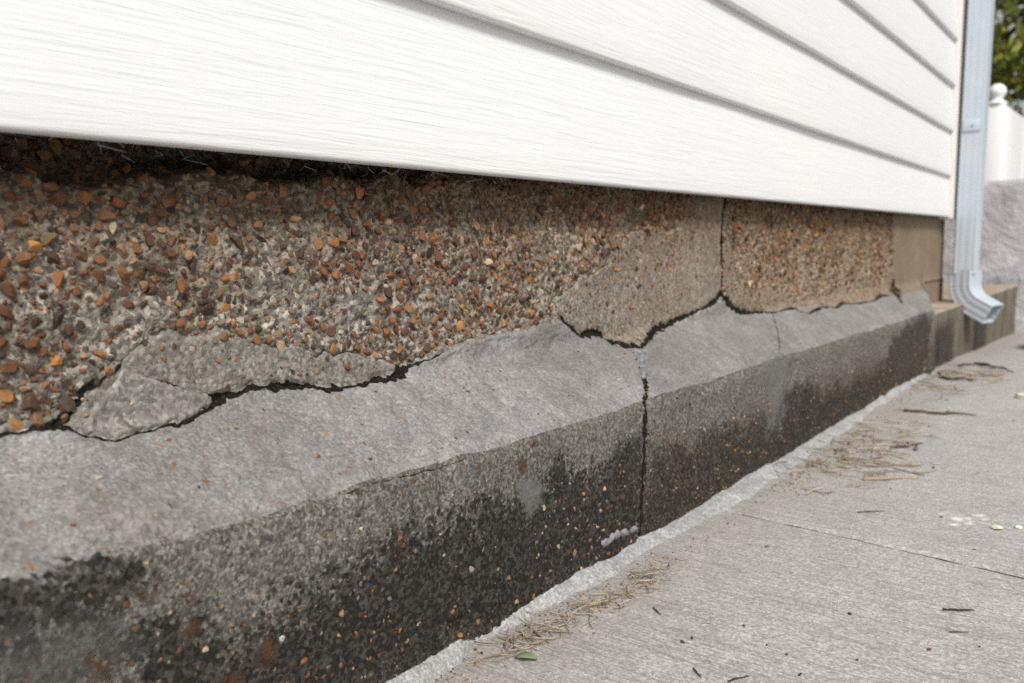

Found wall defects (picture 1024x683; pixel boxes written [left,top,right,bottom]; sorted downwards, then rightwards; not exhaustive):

spalling [0,132,695,441]
crack [559,198,929,351]
crack [0,353,442,442]
water stain [107,313,955,683]
water stain [0,552,156,655]